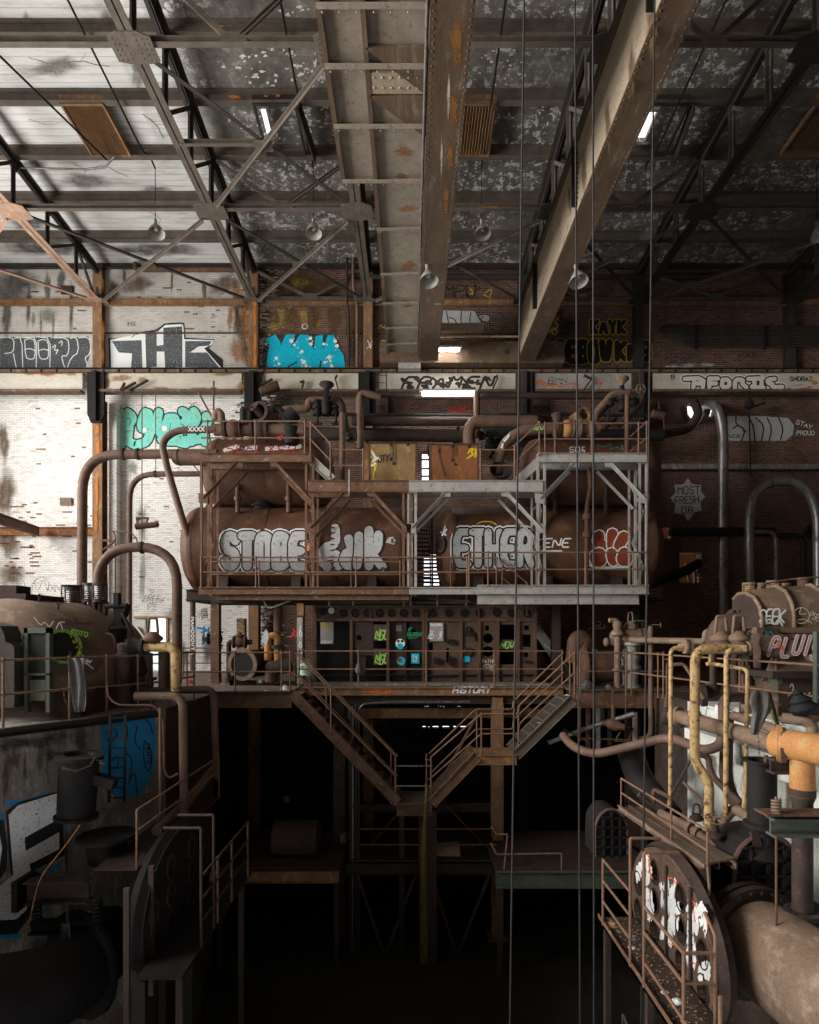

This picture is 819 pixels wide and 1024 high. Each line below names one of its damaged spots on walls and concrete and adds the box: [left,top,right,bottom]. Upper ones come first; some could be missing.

peeling [221,48,323,86]